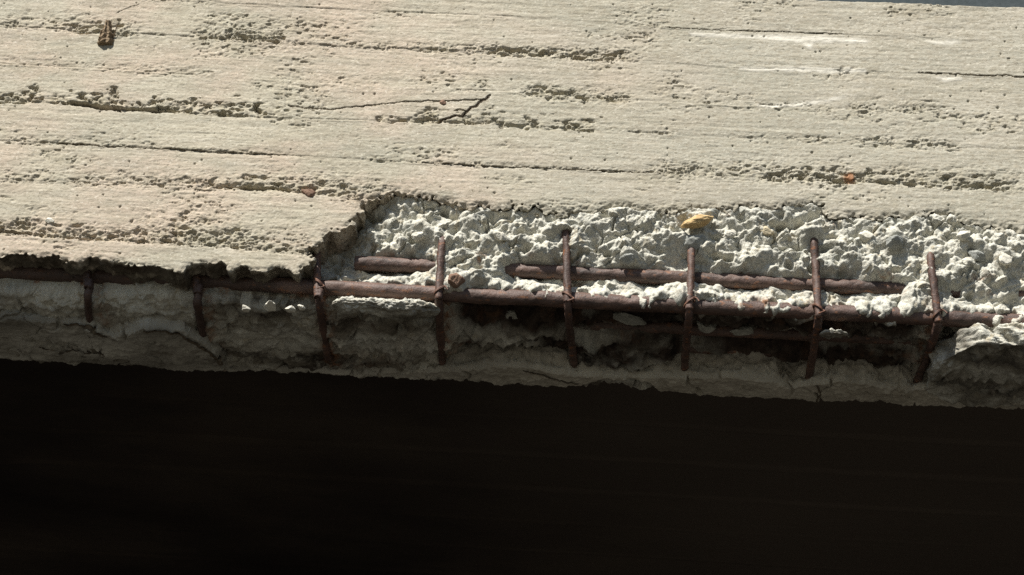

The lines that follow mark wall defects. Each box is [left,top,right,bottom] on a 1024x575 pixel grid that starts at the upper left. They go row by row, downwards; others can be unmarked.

crack [288,94,491,124]
spalling [0,196,1024,390]